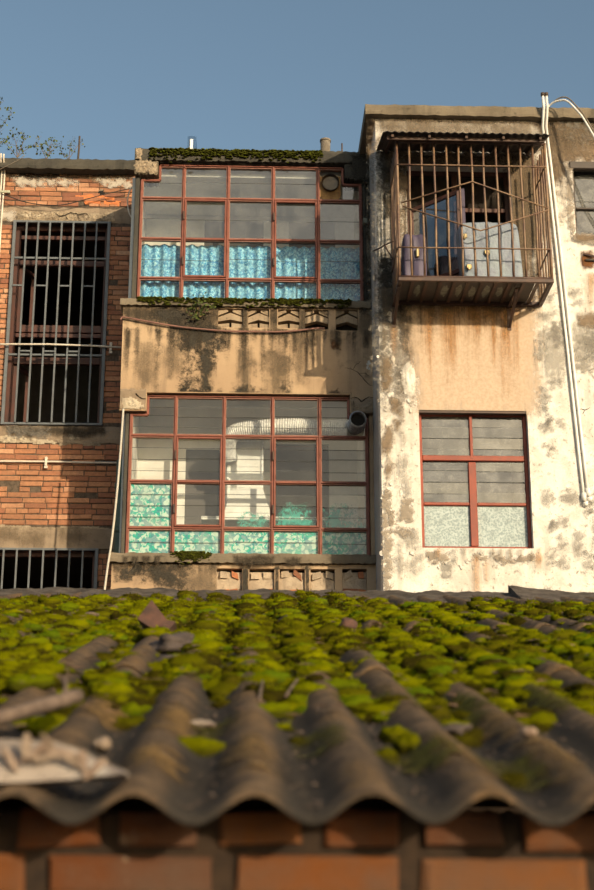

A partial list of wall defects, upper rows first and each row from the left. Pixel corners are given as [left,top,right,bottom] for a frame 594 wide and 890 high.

damp [123,118,594,393]
peeling [380,481,416,591]
peeling [410,549,535,570]